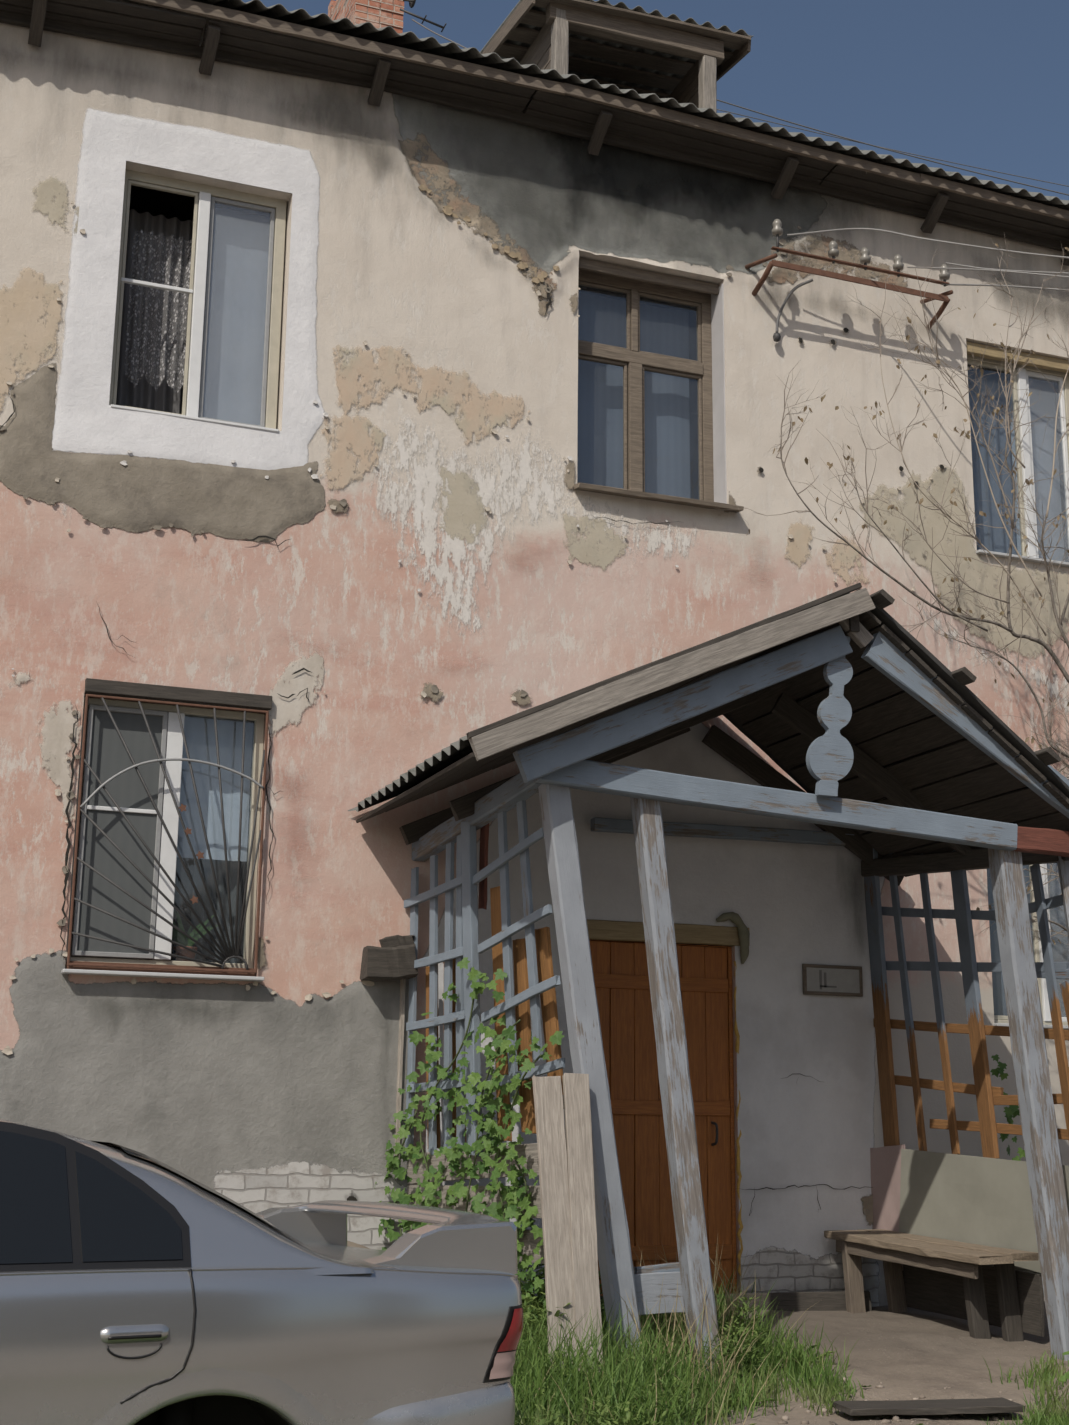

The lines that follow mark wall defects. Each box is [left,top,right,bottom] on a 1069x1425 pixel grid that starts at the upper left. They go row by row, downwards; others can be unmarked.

peeling [32,176,85,234]
spalling [392,94,908,317]
damp [444,90,857,241]
peeling [0,267,63,431]
peeling [307,340,697,632]
peeling [860,464,1069,712]
peeling [268,652,325,736]
peeling [37,700,81,823]
flaking render [214,1161,407,1250]
crack [738,1184,873,1216]
flaking render [741,1246,845,1293]
flaking render [861,1257,880,1307]